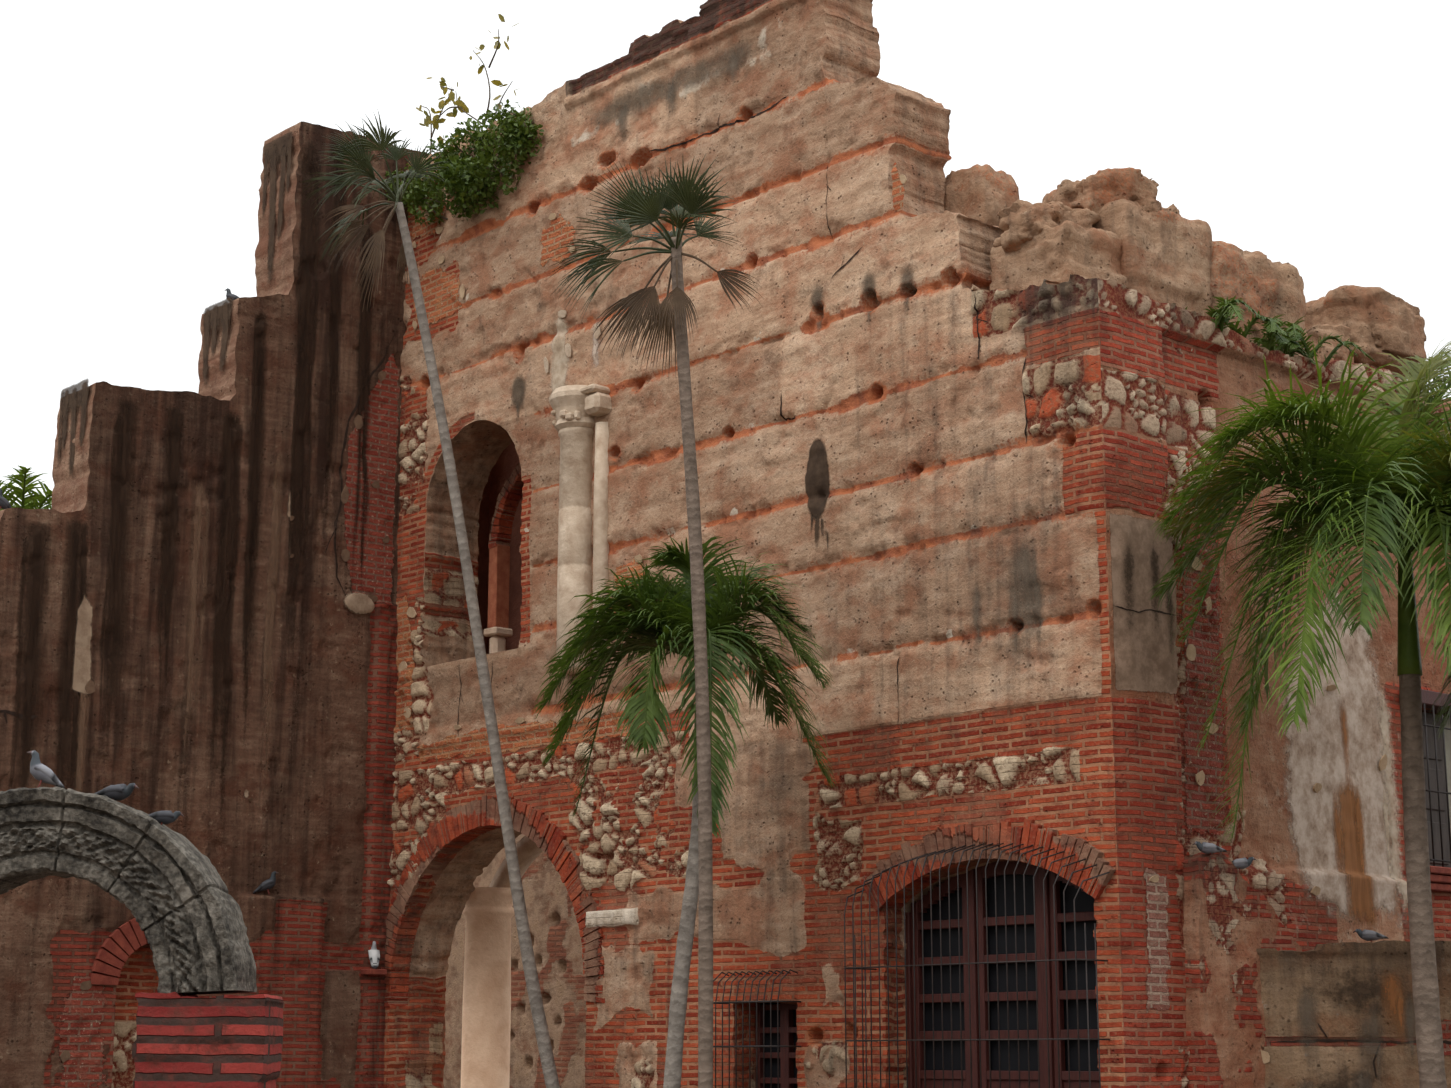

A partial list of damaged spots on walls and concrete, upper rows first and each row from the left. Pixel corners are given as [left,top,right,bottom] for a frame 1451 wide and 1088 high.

damp [57,379,89,474]
damp [159,408,182,650]
damp [203,297,232,384]
damp [213,314,266,761]
damp [262,132,347,586]
damp [353,230,374,562]
damp [805,439,830,548]
damp [1124,549,1173,645]
peeling [1286,593,1402,925]
damp [1299,972,1387,1088]